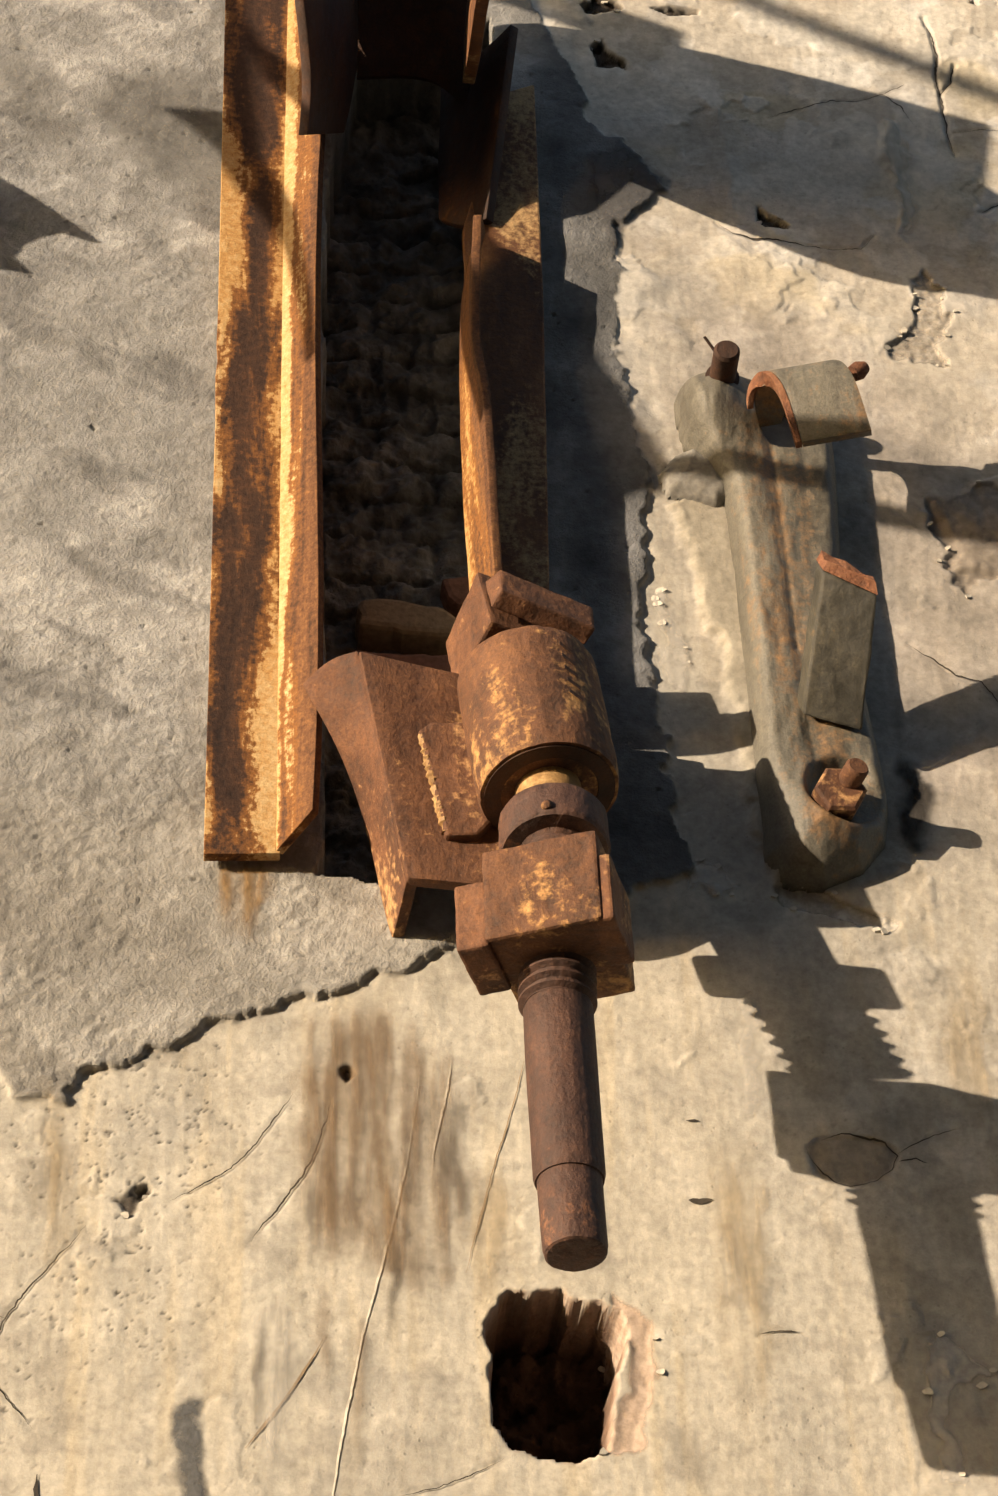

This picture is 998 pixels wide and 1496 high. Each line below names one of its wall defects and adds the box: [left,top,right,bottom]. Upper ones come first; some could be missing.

flaking render [969,0,998,8]
crack [773,19,996,154]
crack [725,228,870,250]
crack [907,644,998,702]
corrosion [307,1023,385,1137]
crack [0,1225,86,1331]
corrosion [371,1181,405,1284]
crack [0,1389,28,1424]
spalling [486,1292,665,1464]